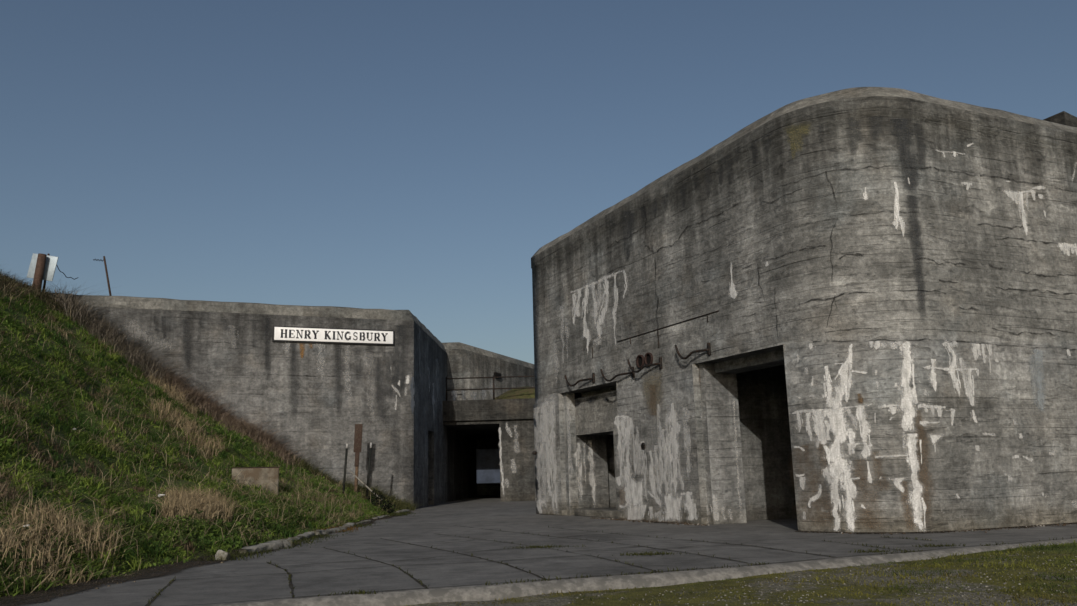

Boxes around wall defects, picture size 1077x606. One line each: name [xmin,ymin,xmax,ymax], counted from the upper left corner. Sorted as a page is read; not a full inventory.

damp [1006,181,1044,235]
damp [572,193,667,351]
damp [729,263,737,299]
damp [384,325,415,414]
damp [614,403,708,521]
damp [793,344,877,532]